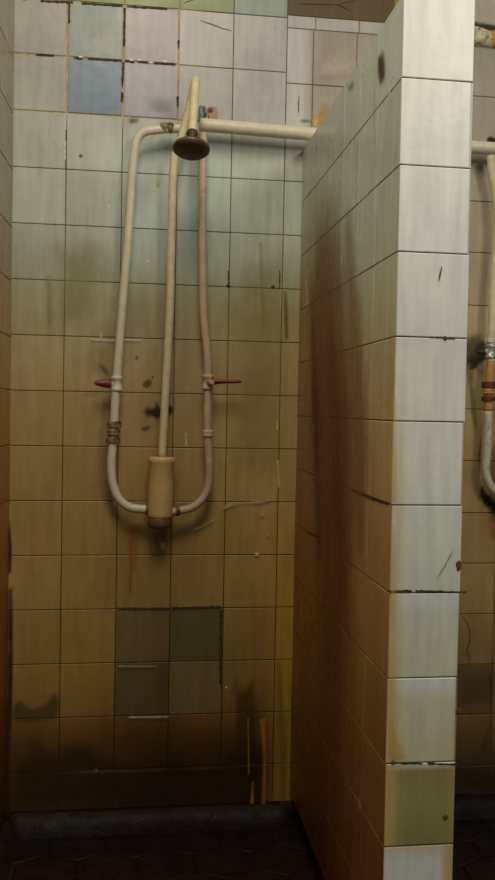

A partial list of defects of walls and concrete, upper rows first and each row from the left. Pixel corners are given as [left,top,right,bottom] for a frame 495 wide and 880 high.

spalling [474,22,495,48]
leakage [466,337,485,387]
leakage [145,404,173,417]